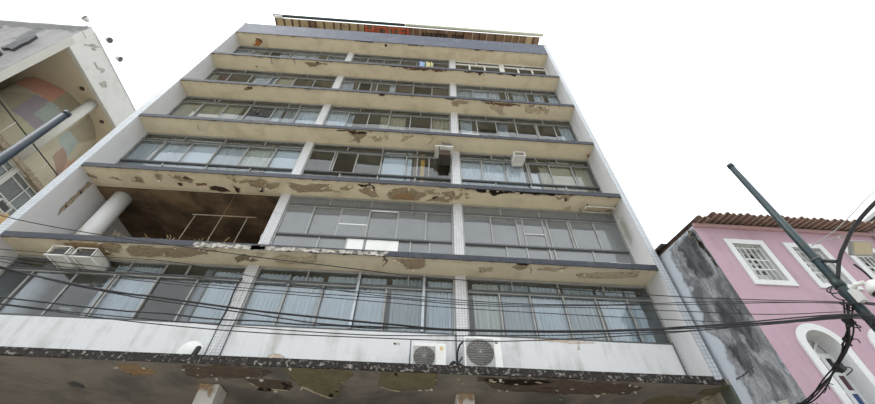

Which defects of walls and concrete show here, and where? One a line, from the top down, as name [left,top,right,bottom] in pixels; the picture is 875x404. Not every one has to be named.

peeling [485,101,549,115]
flaking render [337,130,389,143]
peeling [155,174,577,203]
peeling [64,242,212,258]
peeling [235,253,317,264]
water stain [670,229,811,404]
spalling [0,348,727,400]